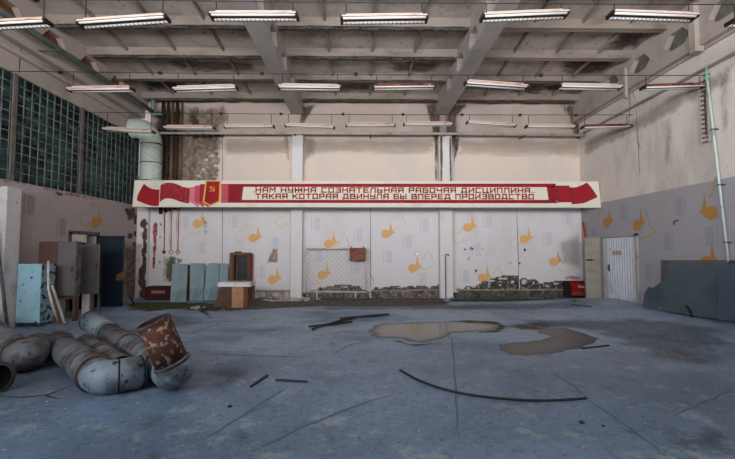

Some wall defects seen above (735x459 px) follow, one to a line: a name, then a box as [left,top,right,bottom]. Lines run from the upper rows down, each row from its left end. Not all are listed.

mould [613,33,649,48]
damp [123,79,284,180]
damp [300,61,613,181]
flaking render [122,206,162,288]
spalling [453,275,563,298]
crack [451,338,460,439]